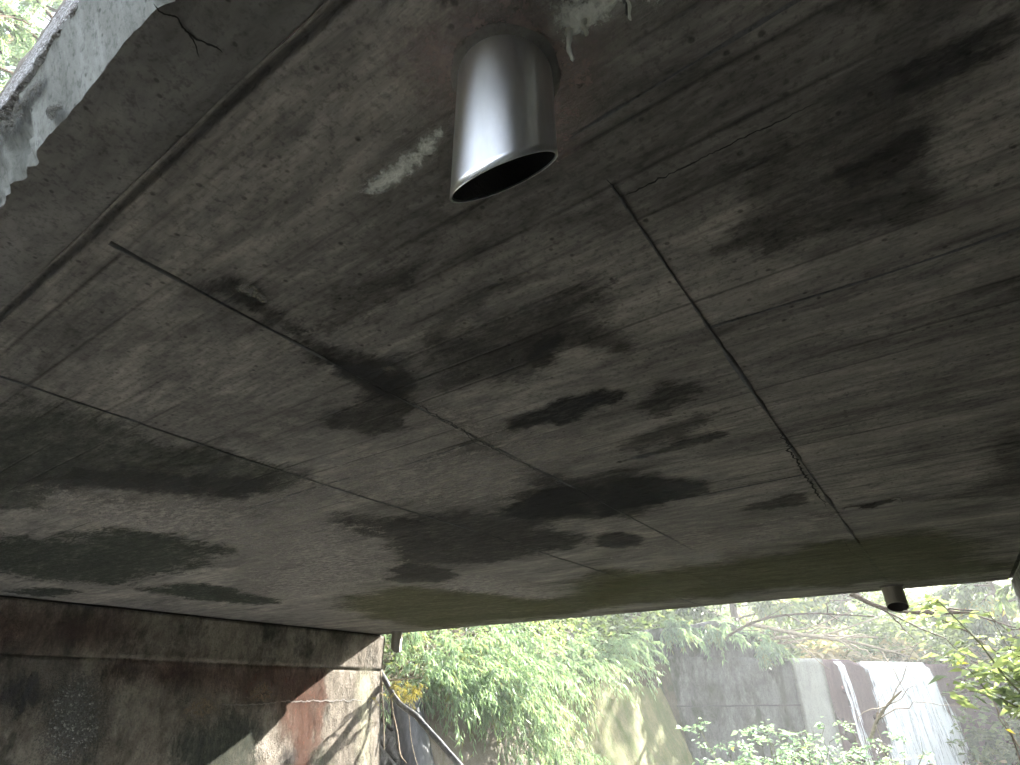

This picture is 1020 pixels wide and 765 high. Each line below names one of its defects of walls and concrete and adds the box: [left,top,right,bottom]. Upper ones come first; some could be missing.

water stain [411,0,632,163]
water stain [367,129,443,194]
water stain [200,277,419,436]
water stain [426,280,632,391]
water stain [35,469,274,498]
water stain [323,381,728,583]
water stain [165,707,264,765]
water stain [279,744,311,765]